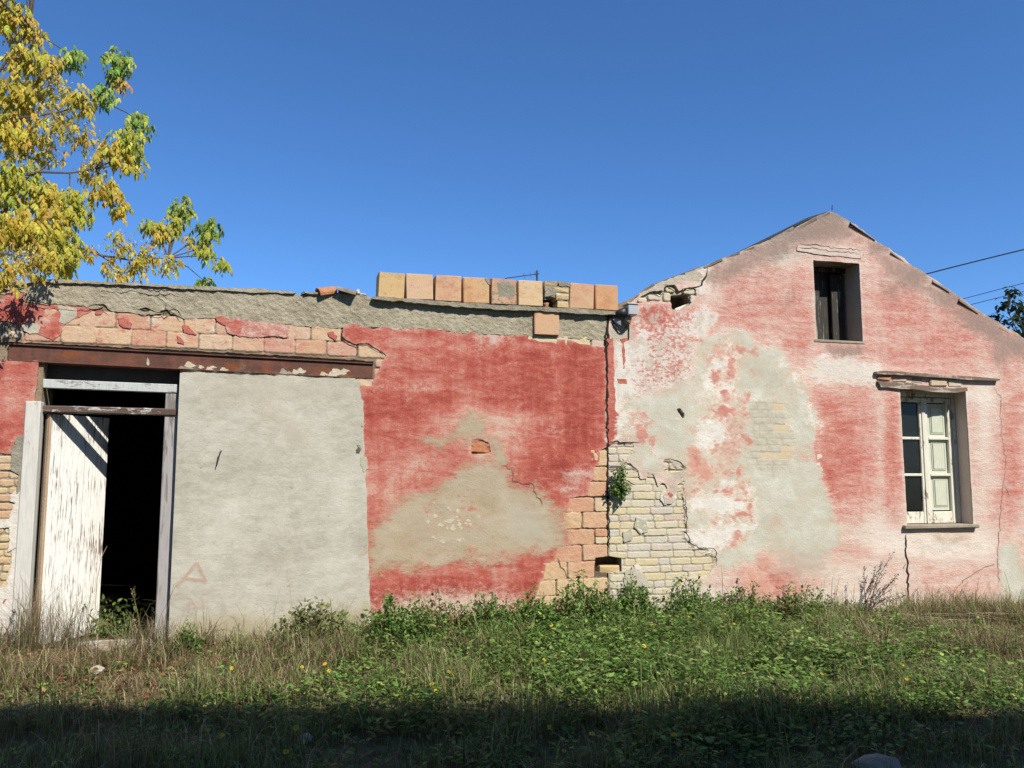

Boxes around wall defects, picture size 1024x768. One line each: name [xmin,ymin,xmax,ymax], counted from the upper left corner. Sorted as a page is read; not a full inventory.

crack [26,285,184,317]
crack [652,268,708,295]
spalling [0,304,386,386]
peeling [366,267,882,618]
crack [951,393,1010,598]
spalling [0,435,23,646]
crack [903,536,911,595]